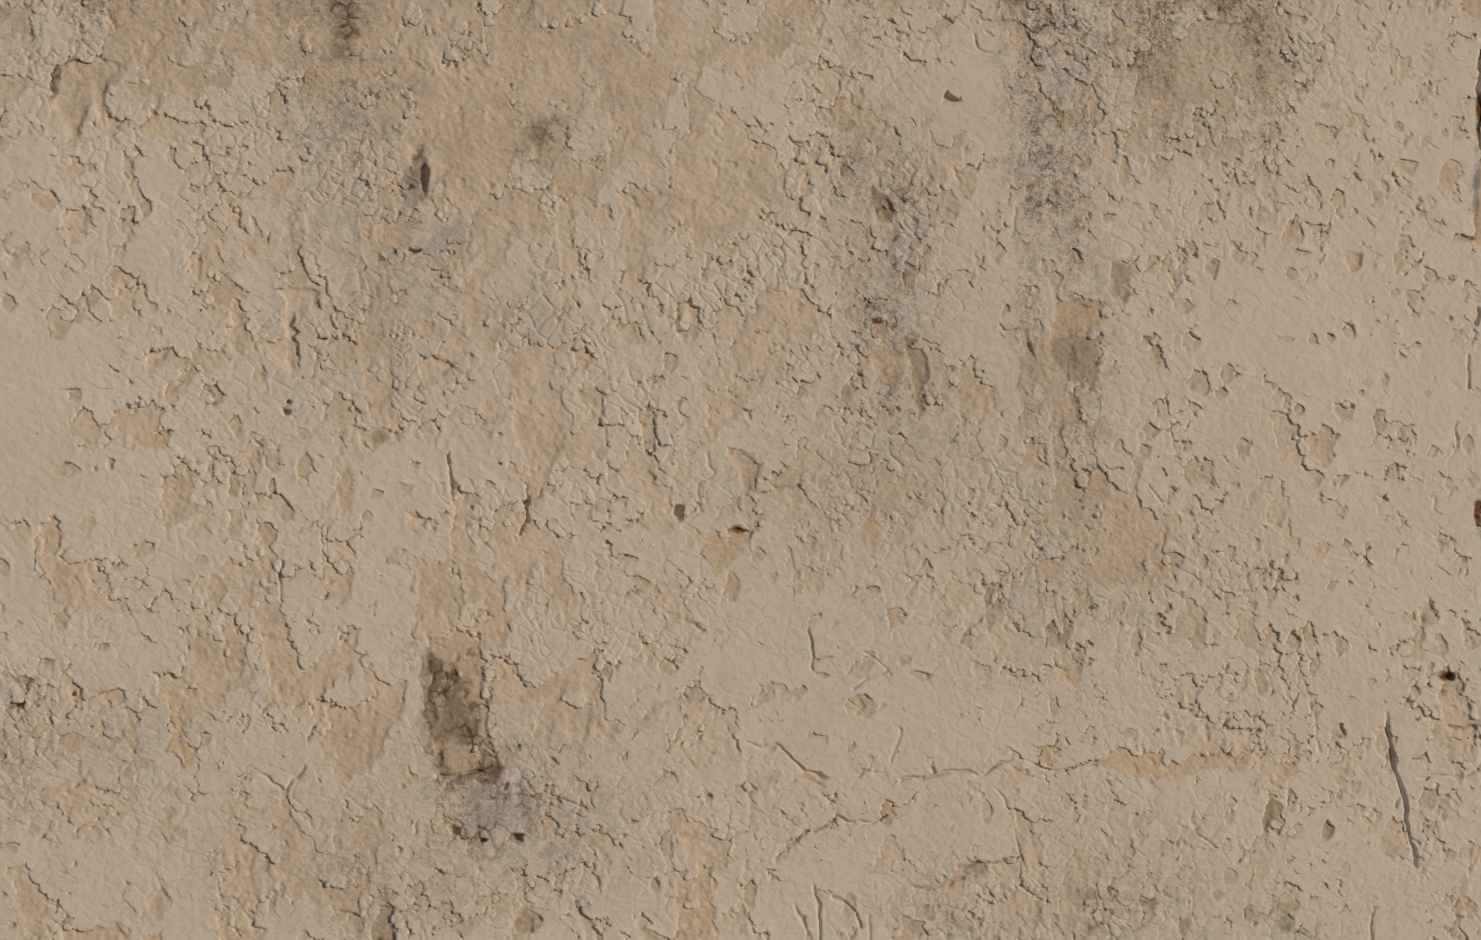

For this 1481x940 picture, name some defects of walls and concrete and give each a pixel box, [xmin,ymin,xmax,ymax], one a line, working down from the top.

peeling [869,0,1481,349]
peeling [0,0,1264,857]
peeling [1264,382,1364,490]
peeling [1372,409,1480,533]
peeling [212,784,603,940]
peeling [530,775,625,895]
peeling [650,769,823,940]
crack [792,884,873,940]
peeling [865,799,929,940]
crack [747,651,1099,903]
peeling [1050,803,1168,940]
peeling [1097,518,1481,940]